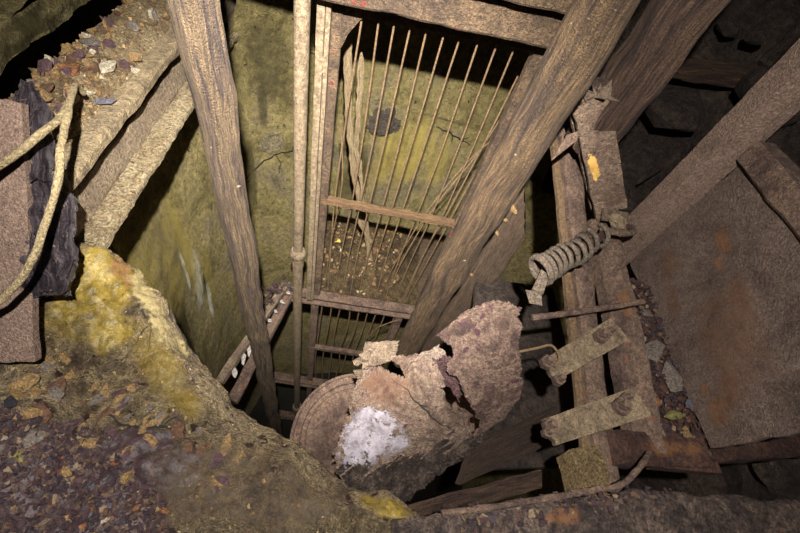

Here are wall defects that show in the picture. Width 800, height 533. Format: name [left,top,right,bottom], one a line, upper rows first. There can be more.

crack [436,126,471,146]
crack [245,149,293,180]